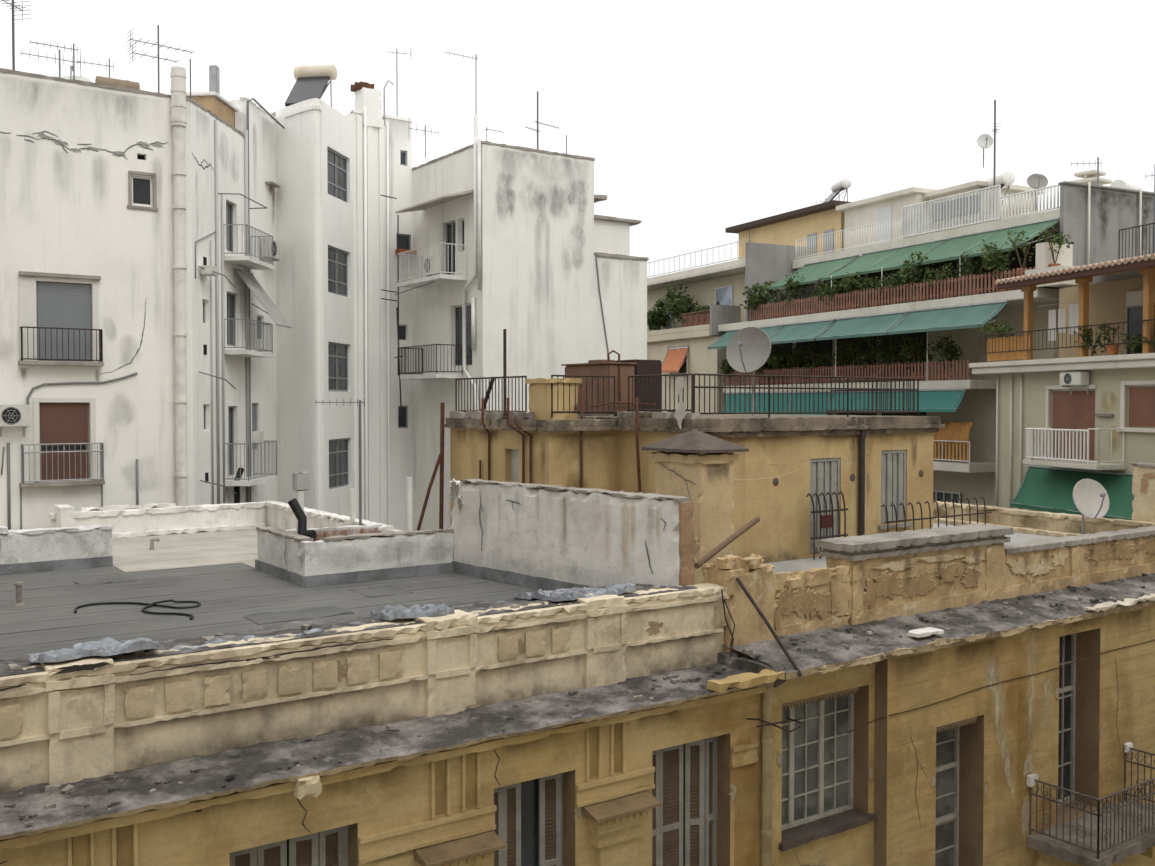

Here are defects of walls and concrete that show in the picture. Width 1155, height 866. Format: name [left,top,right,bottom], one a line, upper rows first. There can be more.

crack [0,131,214,170]
peeling [449,478,464,514]
peeling [1140,473,1155,494]
peeling [775,577,832,620]
peeling [863,552,986,610]
peeling [1006,550,1070,577]